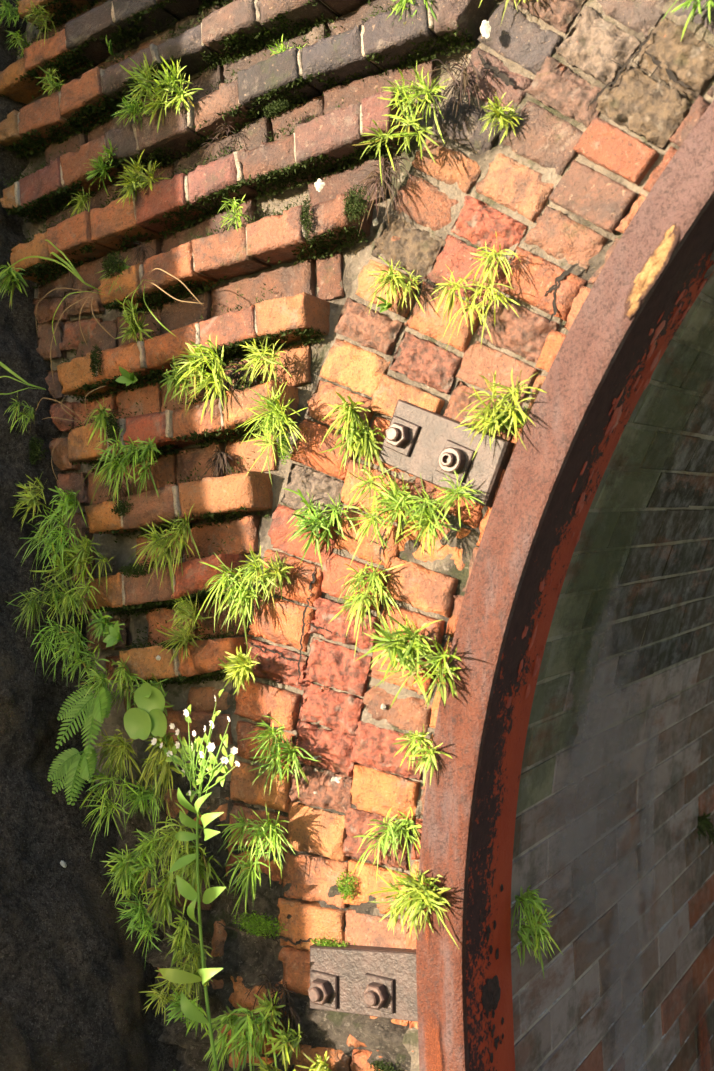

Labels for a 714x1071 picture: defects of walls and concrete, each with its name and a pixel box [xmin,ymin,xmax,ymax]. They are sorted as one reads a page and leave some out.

crack [545,263,579,323]
peeling [623,223,680,319]
peeling [605,289,689,440]
crack [249,564,336,682]
peeling [506,621,545,709]
rust [425,1022,442,1071]
rust [482,975,504,1071]